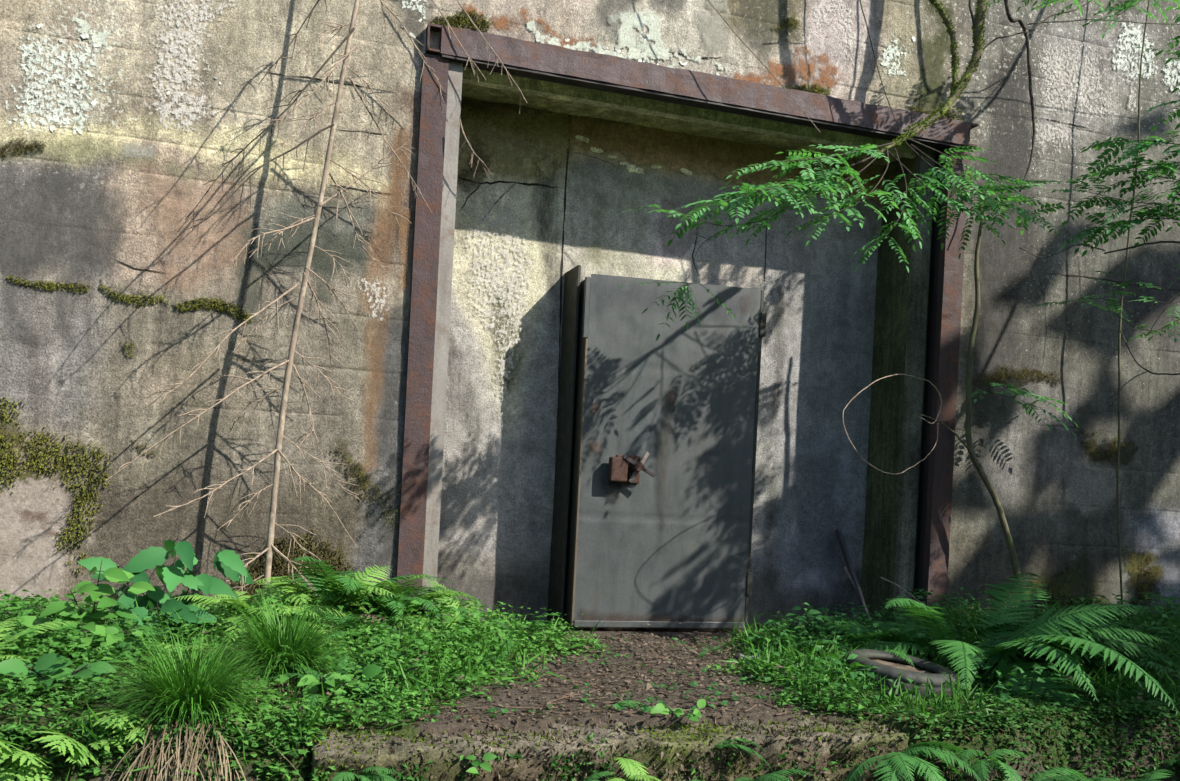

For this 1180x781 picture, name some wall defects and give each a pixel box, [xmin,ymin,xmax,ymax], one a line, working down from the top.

water stain [6,0,114,135]
water stain [147,0,240,132]
rust [734,46,838,90]
water stain [239,221,365,320]
water stain [358,278,398,321]
crack [457,115,617,487]
water stain [969,22,1180,509]